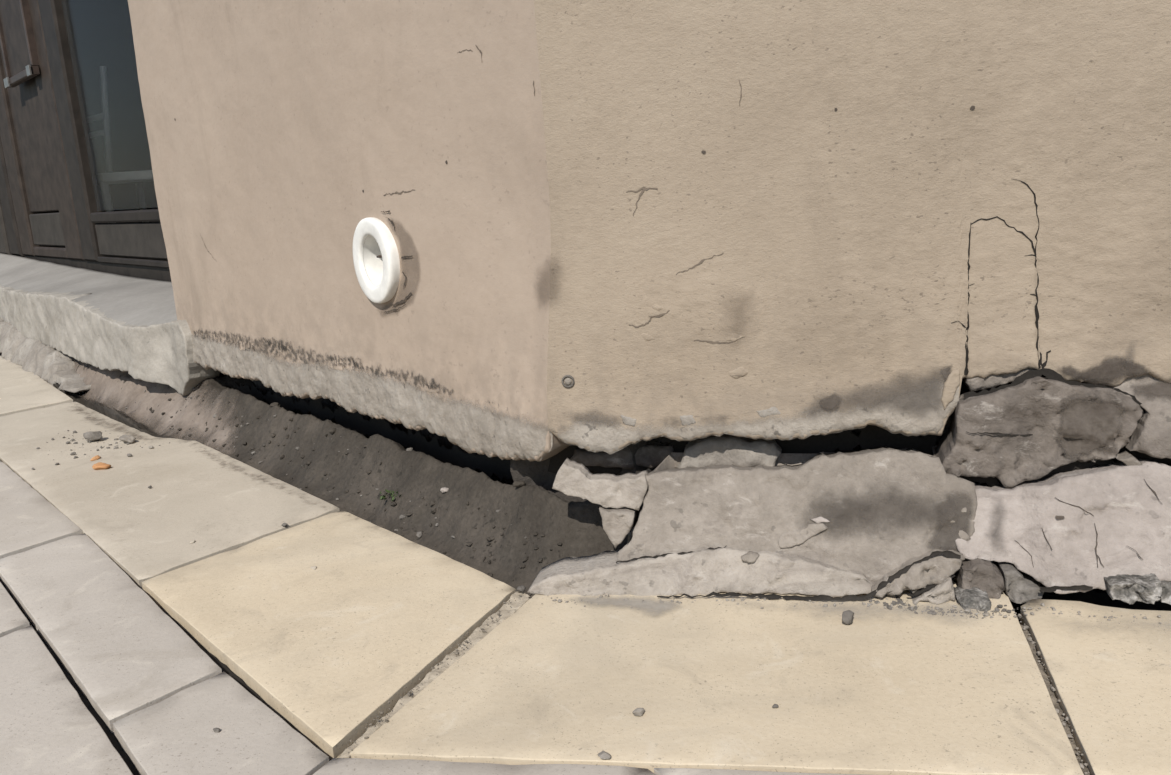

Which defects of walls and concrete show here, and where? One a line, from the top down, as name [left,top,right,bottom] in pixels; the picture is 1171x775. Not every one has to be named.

crack [231,380,513,480]
peeling [192,335,960,549]
crack [775,425,937,455]
leakage [811,367,951,413]
crack [952,179,1171,611]
leakage [1062,357,1171,398]
spalling [1100,374,1171,466]
crack [548,440,727,563]
spalling [741,551,759,563]
peeling [871,495,972,605]